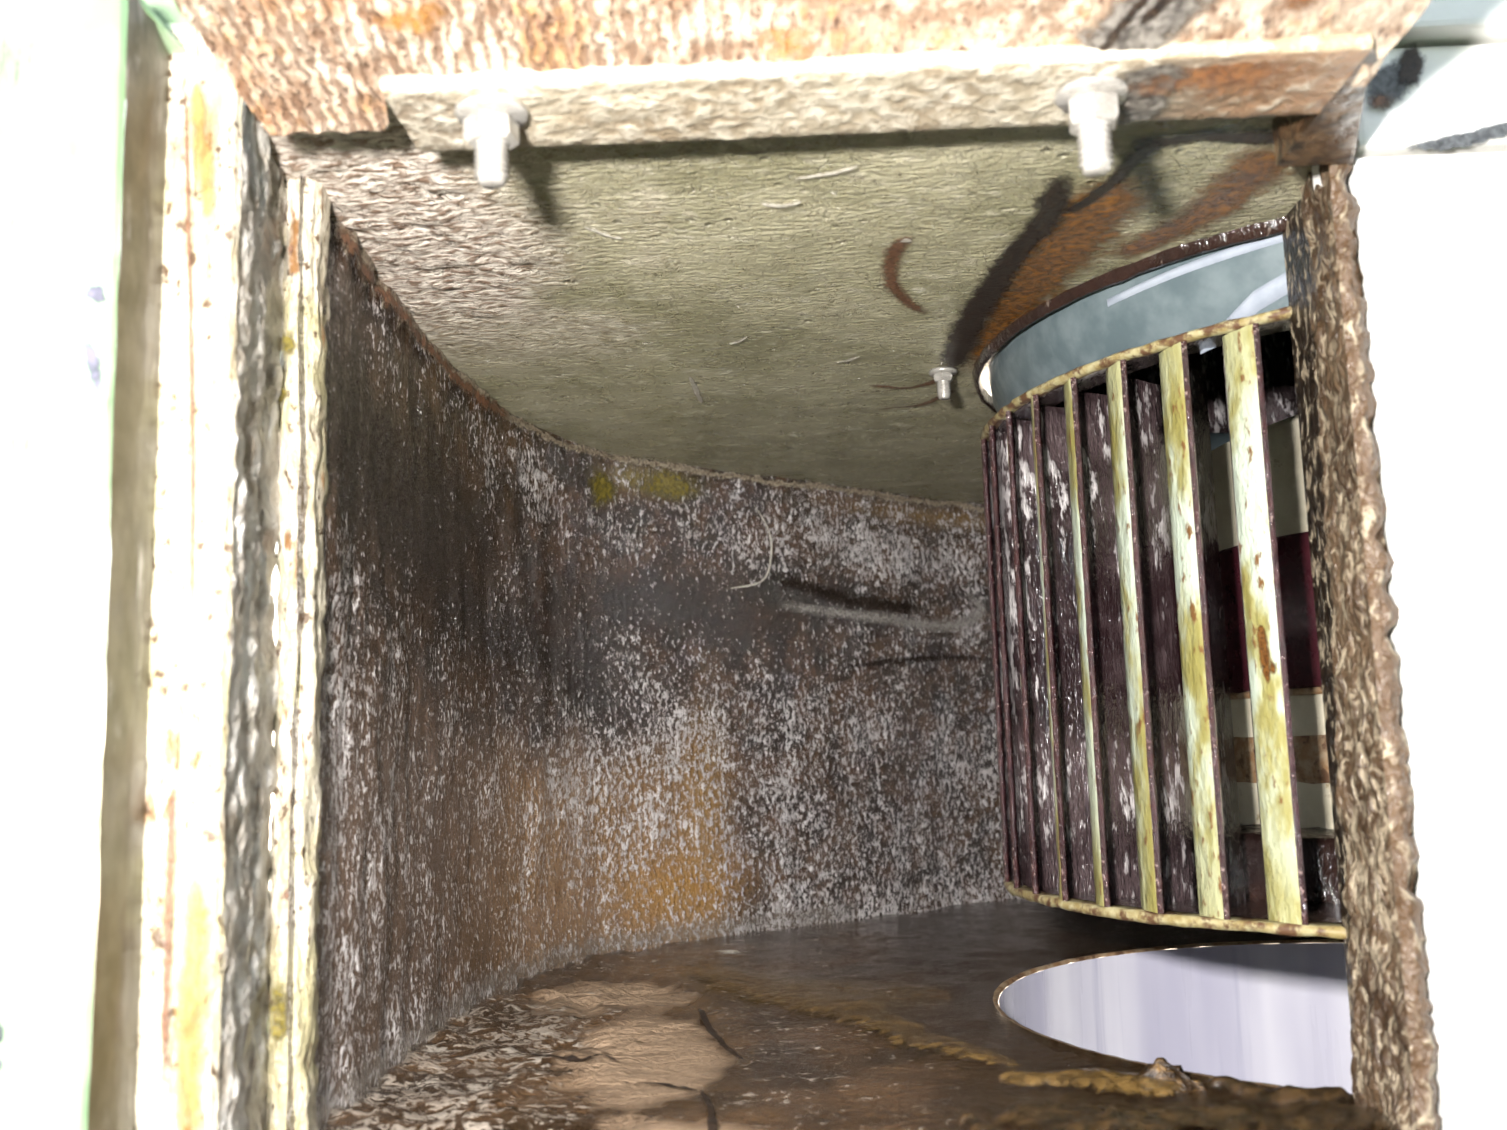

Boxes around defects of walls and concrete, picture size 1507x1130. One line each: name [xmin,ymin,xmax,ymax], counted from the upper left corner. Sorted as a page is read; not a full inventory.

corrosion [391,11,426,32]
water stain [1099,0,1172,51]
corrosion [1287,0,1310,10]
corrosion [1143,61,1283,95]
water stain [781,579,925,611]
water stain [856,654,981,667]
corrosion [160,797,206,1130]
crack [698,1008,744,1060]
crack [530,1053,717,1130]